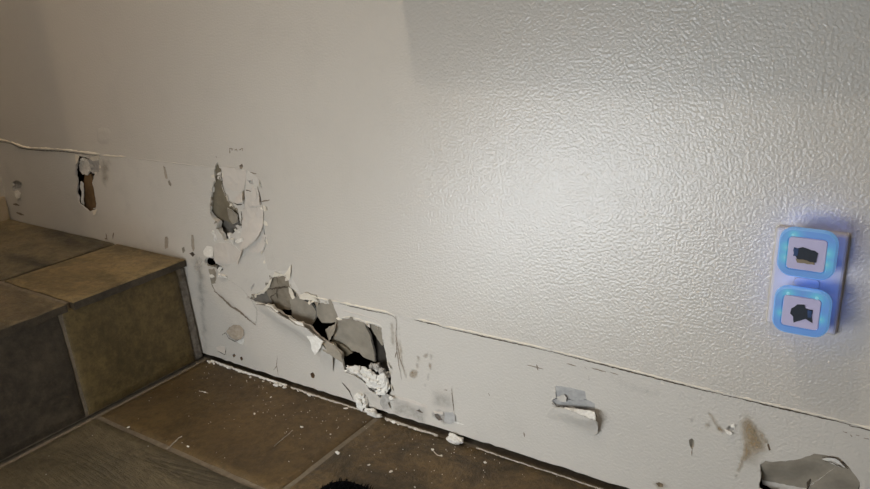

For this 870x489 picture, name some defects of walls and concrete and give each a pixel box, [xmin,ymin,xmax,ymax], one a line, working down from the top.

peeling [307,334,323,355]
spalling [552,385,597,421]